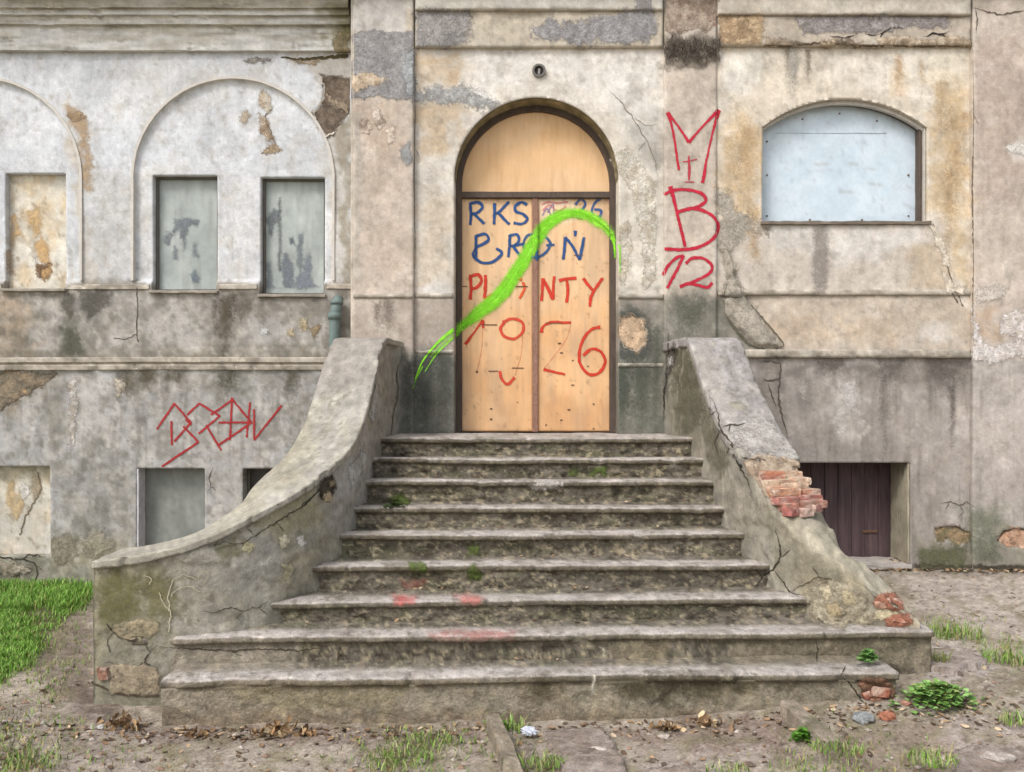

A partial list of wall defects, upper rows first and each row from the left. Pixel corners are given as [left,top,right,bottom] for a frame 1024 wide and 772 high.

crack [831,27,902,38]
peeling [239,89,283,154]
flaking render [311,49,417,139]
crack [604,85,658,184]
crack [115,288,139,342]
flaking render [617,308,652,359]
peeling [970,284,1024,365]
flaking render [0,369,57,411]
crack [762,357,787,434]
crack [709,396,752,497]
flaking render [727,420,828,517]
crack [208,489,319,550]